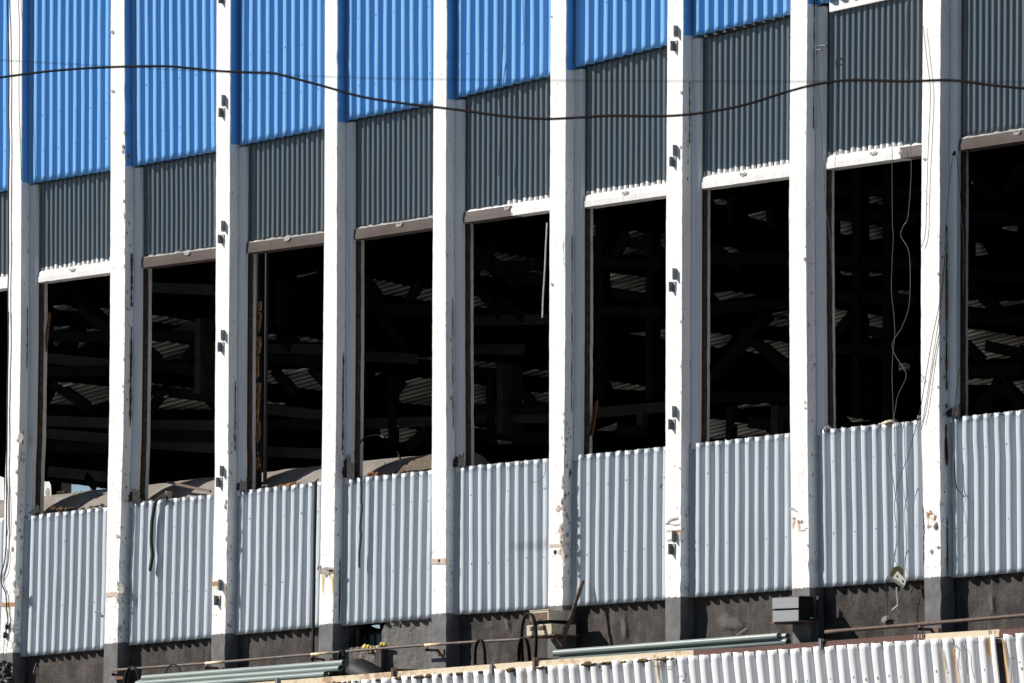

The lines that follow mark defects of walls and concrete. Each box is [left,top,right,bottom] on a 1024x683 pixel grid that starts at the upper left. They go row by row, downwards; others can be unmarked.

spalling [555,413,571,588]
corrosion [321,557,341,622]